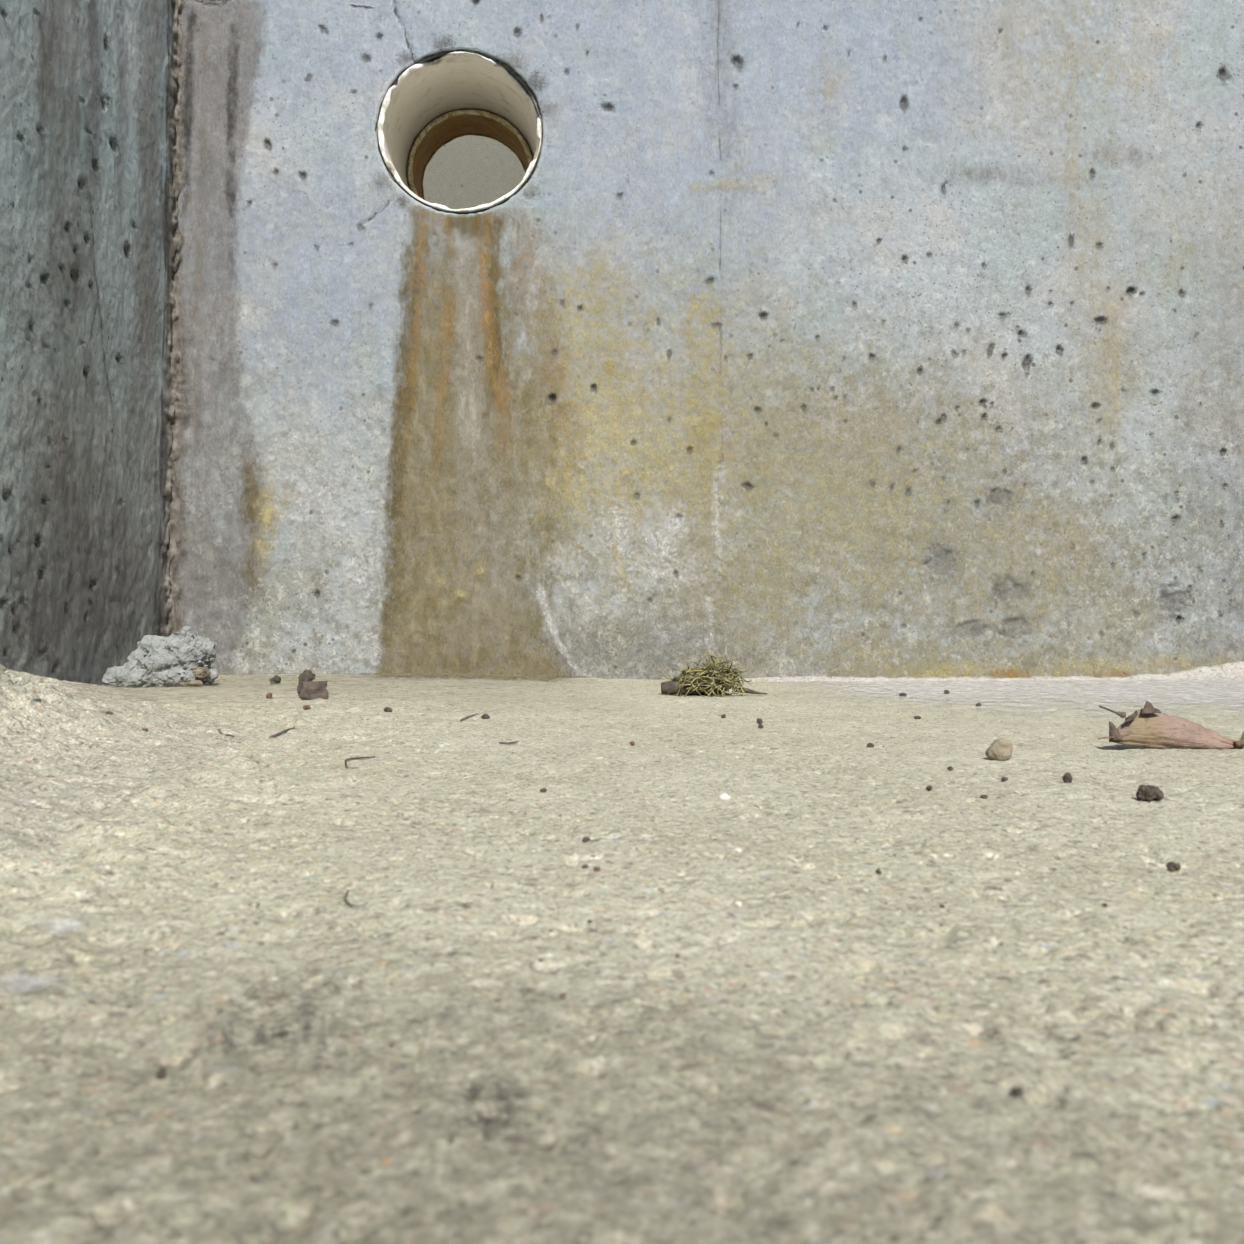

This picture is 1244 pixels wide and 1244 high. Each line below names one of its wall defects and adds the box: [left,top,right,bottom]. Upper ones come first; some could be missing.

crack [155,589,163,636]
crack [158,0,227,556]
rust [375,133,565,680]